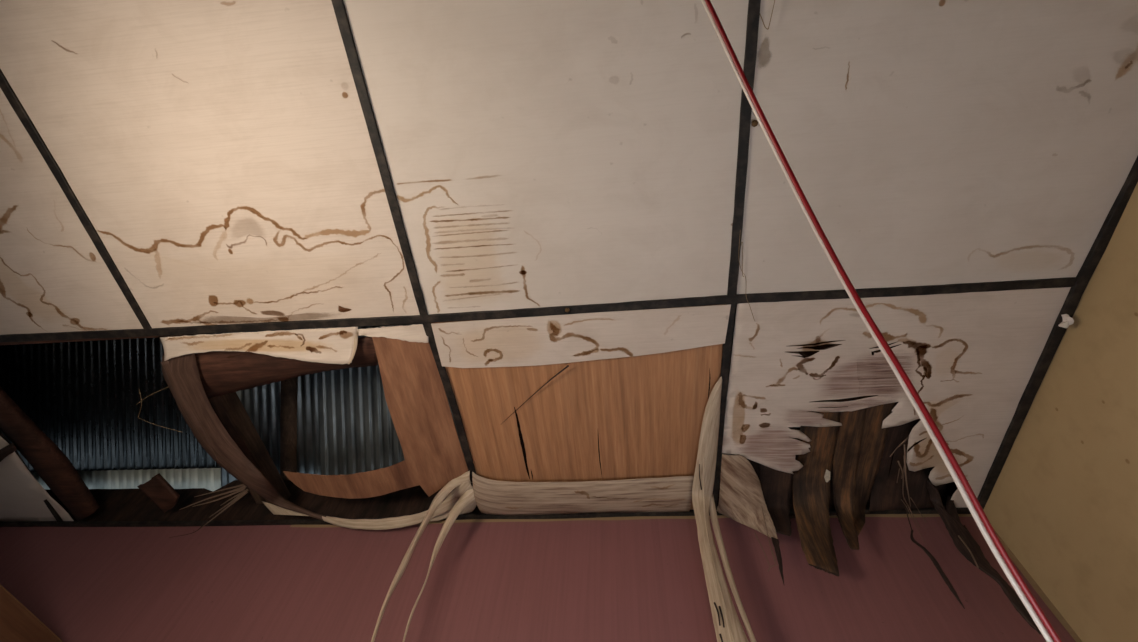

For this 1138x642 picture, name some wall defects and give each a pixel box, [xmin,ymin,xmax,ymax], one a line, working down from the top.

damp [198,206,300,246]
damp [797,356,840,377]
damp [882,333,941,394]
peeling [160,324,458,530]
crack [514,407,533,479]
peeling [716,454,784,584]